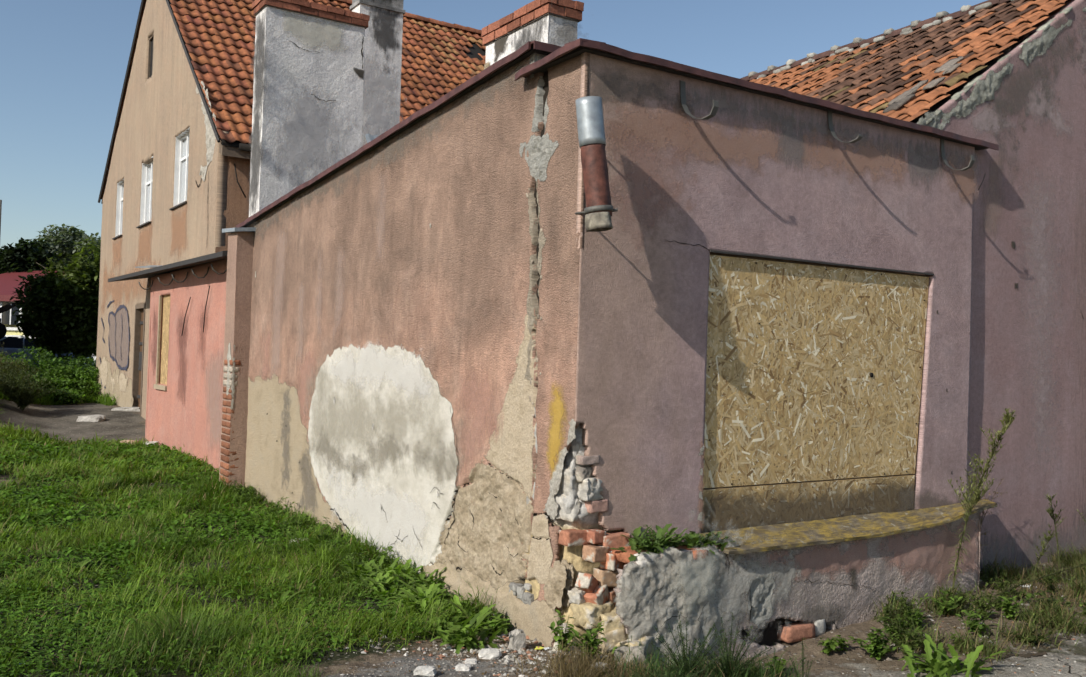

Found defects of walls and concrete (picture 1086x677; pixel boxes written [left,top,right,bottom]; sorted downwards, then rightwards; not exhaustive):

crack [531,71,549,137]
peeling [916,6,1086,132]
corrosion [581,143,612,216]
crack [525,182,546,417]
damp [547,386,564,472]
spalling [435,314,655,667]
peeling [731,520,978,626]